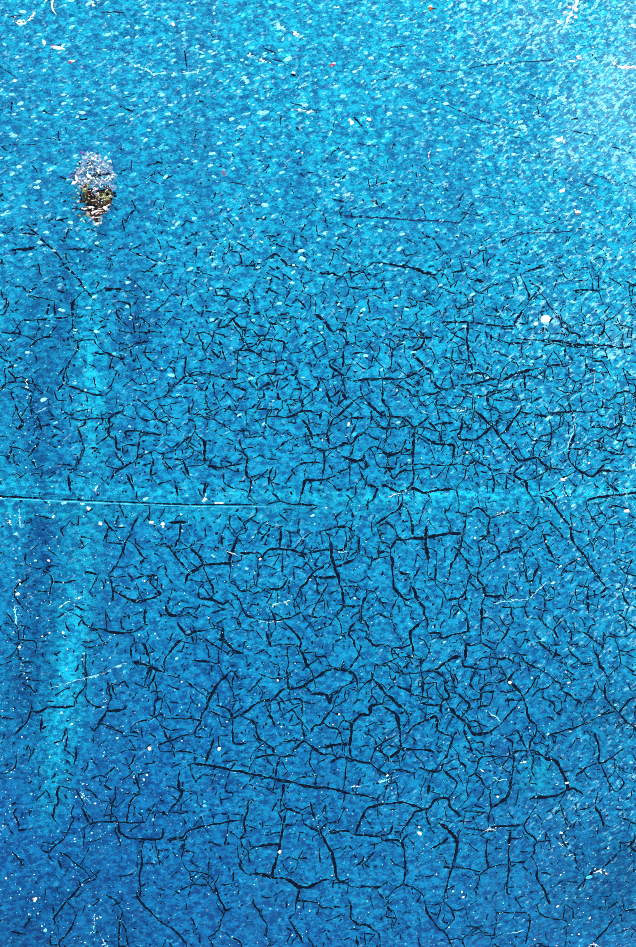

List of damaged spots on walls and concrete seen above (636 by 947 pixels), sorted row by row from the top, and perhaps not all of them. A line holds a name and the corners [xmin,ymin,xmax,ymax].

crack [247,46,288,65]
crack [108,92,137,127]
crack [264,88,334,130]
crack [46,118,87,145]
crack [571,118,631,153]
peeling [68,151,117,226]
crack [119,155,193,188]
crack [211,153,272,202]
crack [324,147,351,189]
crack [357,142,409,219]
crack [585,170,636,194]
crack [0,191,636,947]